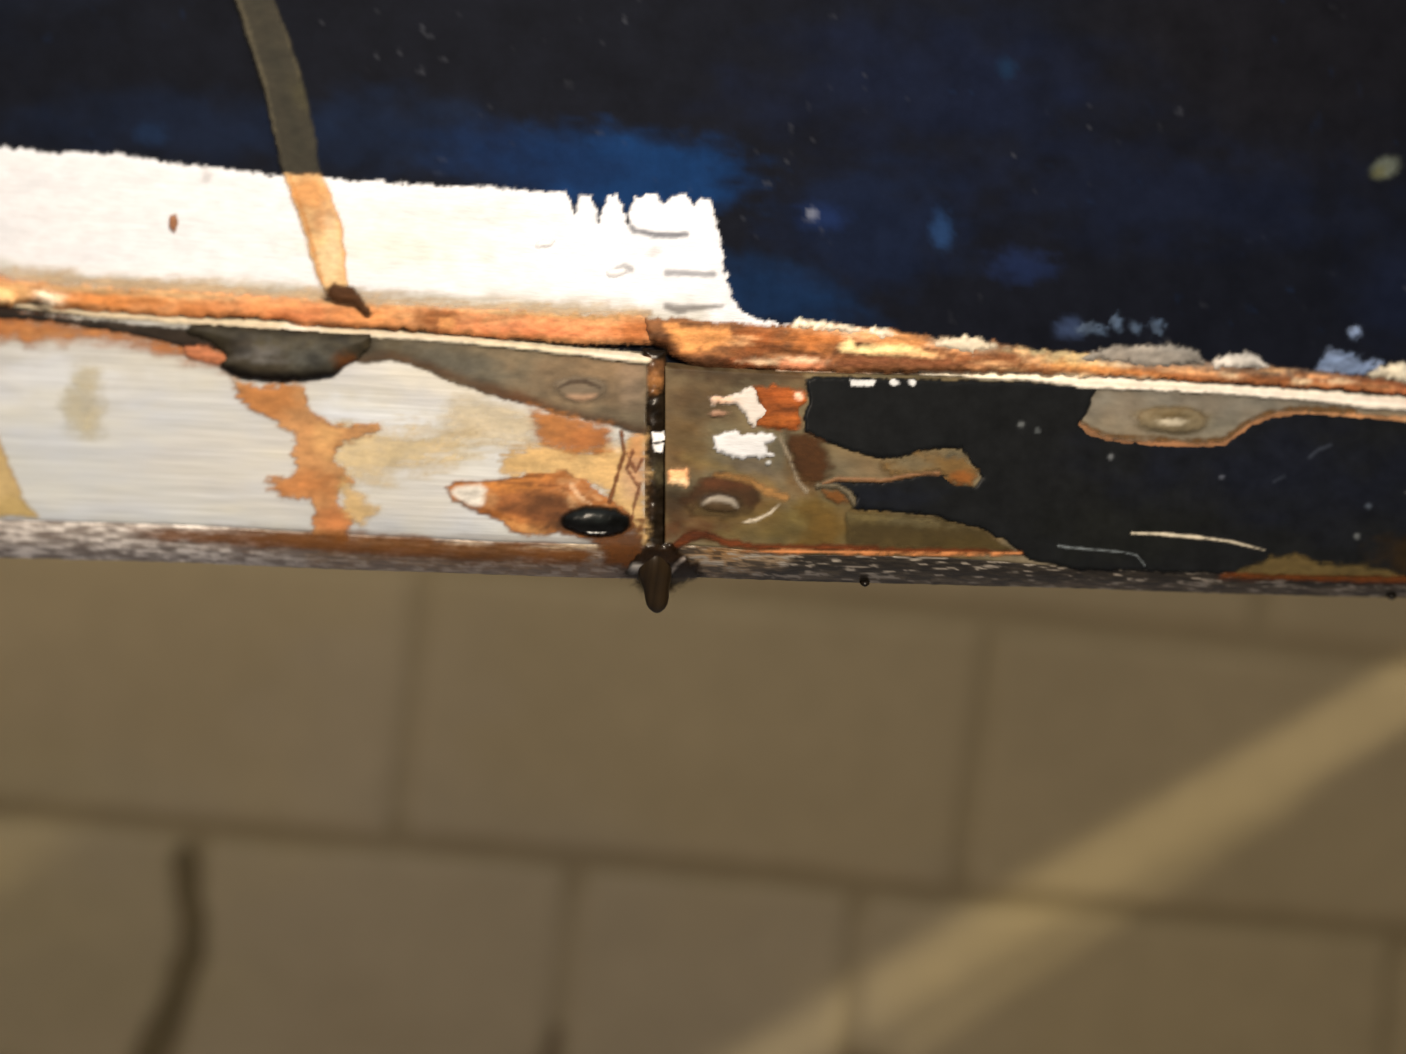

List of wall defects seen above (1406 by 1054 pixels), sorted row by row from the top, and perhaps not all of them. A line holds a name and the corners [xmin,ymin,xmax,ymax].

water stain [236,0,372,317]
corrosion [0,446,38,517]
corrosion [0,275,330,354]
corrosion [148,382,651,568]
peeling [356,337,665,452]
corrosion [669,383,1024,556]
peeling [1078,406,1406,447]
crack [133,848,206,1054]